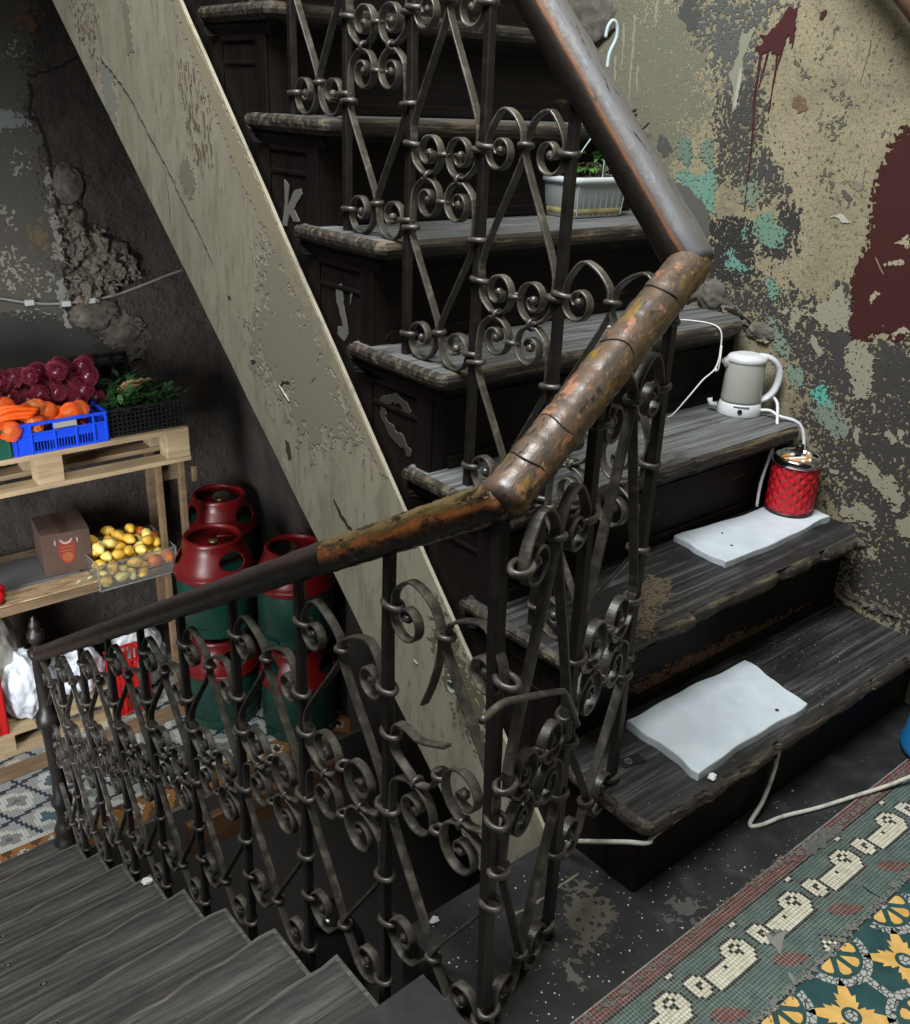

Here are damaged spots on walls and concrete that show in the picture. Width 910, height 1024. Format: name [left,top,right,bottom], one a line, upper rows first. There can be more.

spalling [42,161,143,336]
crack [27,56,213,320]
peeling [177,58,214,176]
peeling [673,0,910,637]
spalling [282,440,292,471]